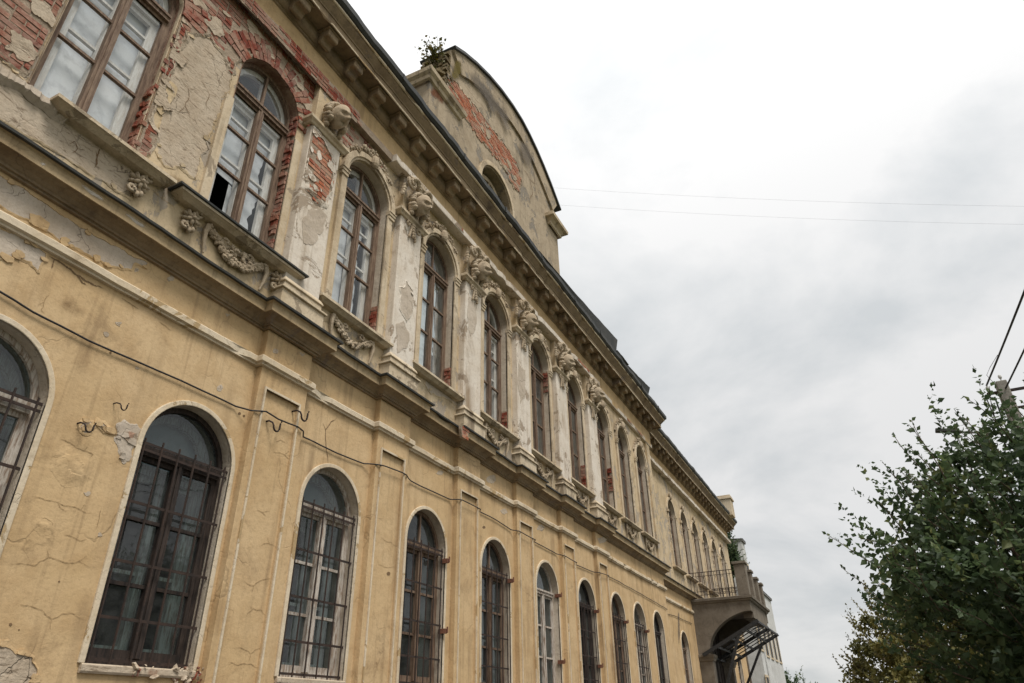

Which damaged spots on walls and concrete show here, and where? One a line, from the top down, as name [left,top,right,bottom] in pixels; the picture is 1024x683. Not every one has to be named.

flaking render [0,0,133,201]
flaking render [127,0,387,249]
flaking render [420,51,522,193]
flaking render [0,173,149,274]
peeling [396,280,415,353]
spalling [76,417,141,464]
crack [17,496,101,569]
flaking render [0,639,42,683]